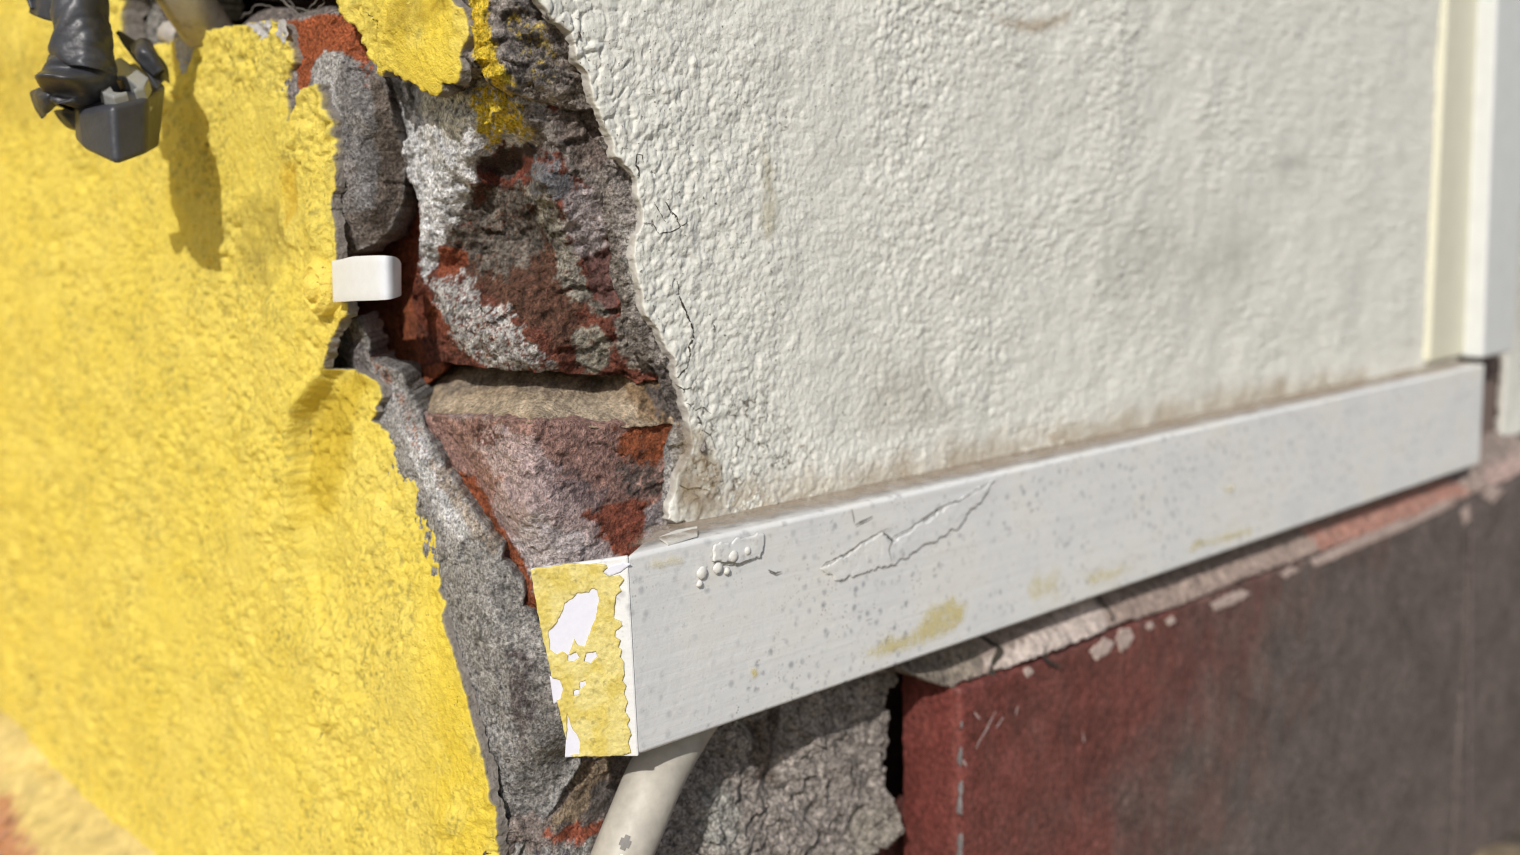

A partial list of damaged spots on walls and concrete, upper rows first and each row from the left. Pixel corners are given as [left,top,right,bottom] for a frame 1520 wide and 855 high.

spalling [143,0,194,74]
flaking render [454,0,593,112]
flaking render [217,0,419,258]
flaking render [598,136,706,545]
flaking render [333,310,632,855]
peeling [821,480,995,581]
peeling [1089,616,1176,660]
peeling [1210,589,1251,611]
peeling [1280,485,1505,579]